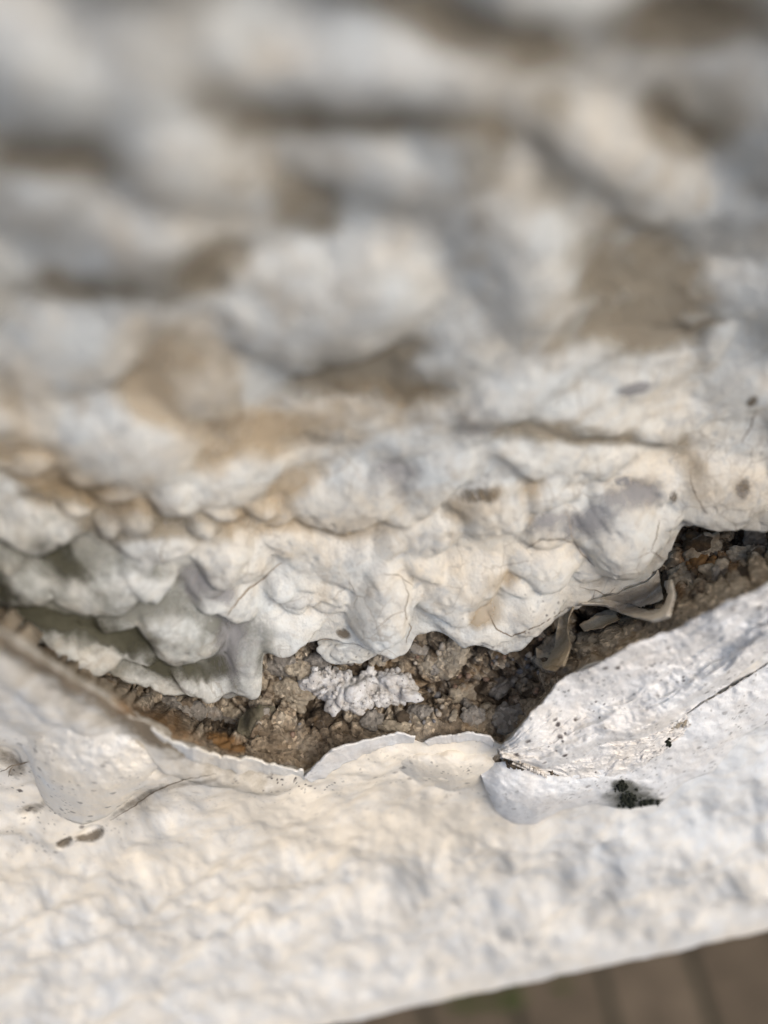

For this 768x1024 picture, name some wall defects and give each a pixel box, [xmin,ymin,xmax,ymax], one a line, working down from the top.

crack [528,512,622,598]
crack [639,520,665,559]
spalling [0,525,768,791]
crack [488,608,566,637]